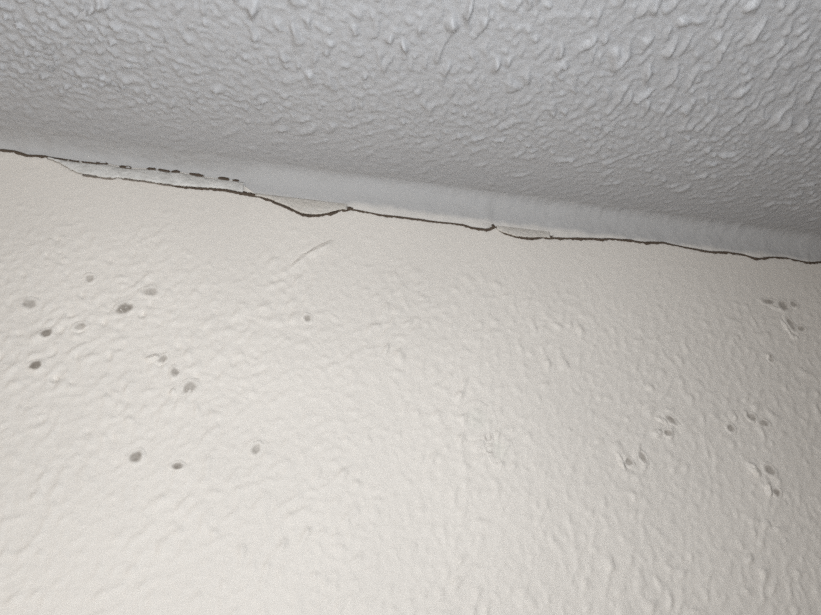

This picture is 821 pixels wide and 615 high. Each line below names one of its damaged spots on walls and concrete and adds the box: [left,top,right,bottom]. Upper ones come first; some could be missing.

crack [0,149,821,264]